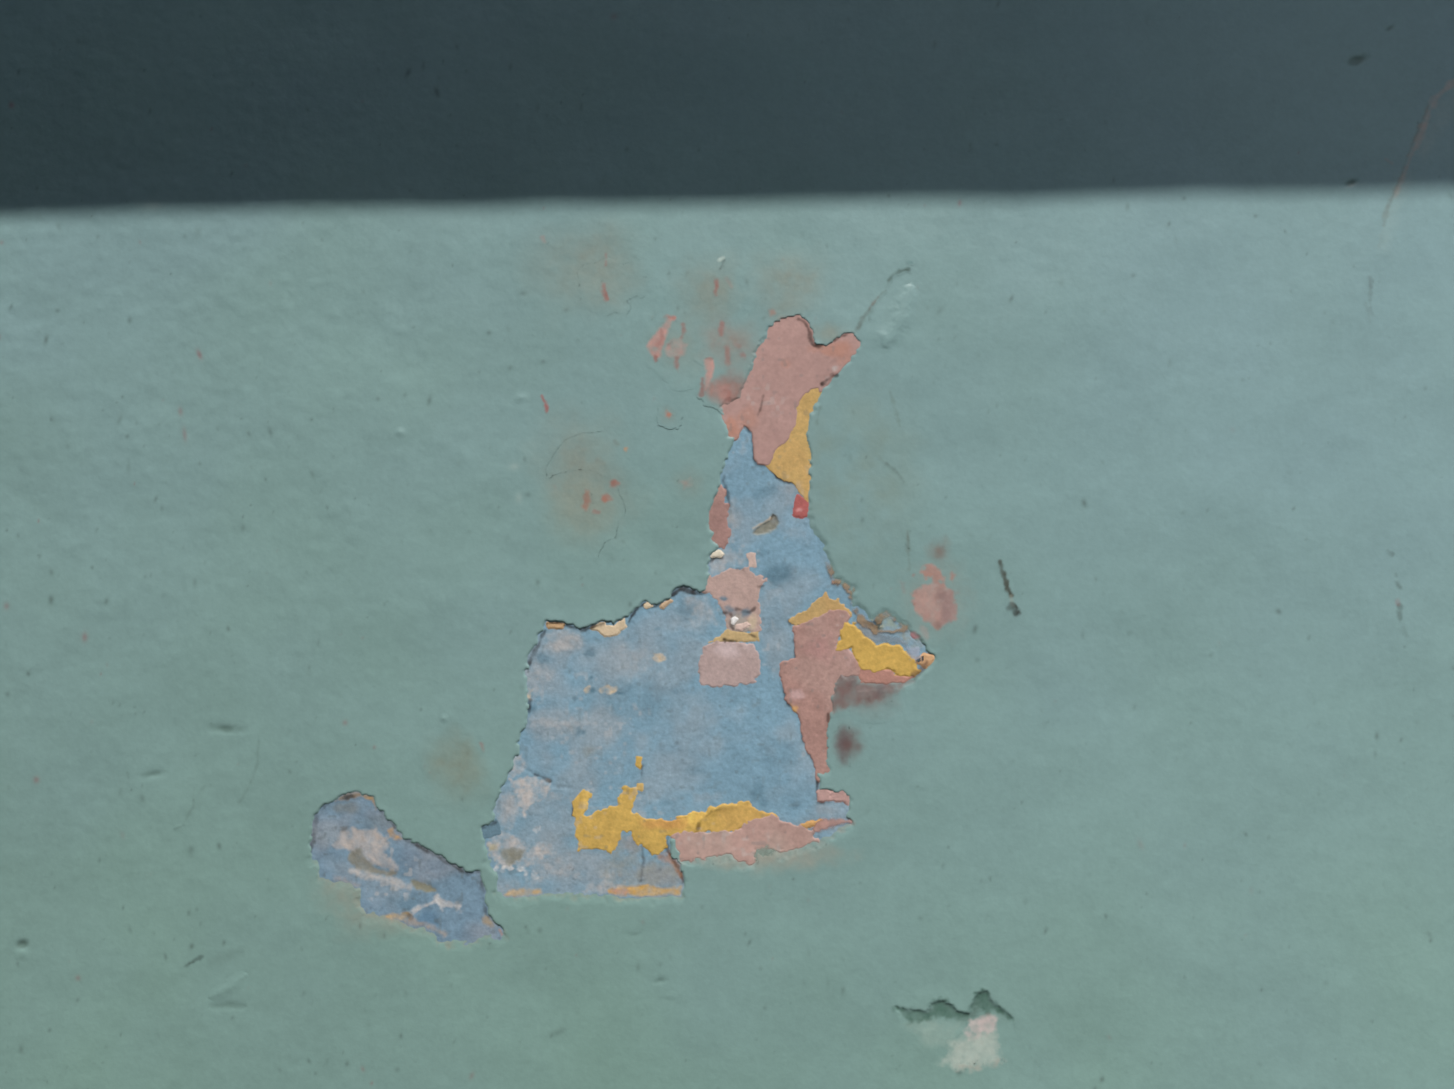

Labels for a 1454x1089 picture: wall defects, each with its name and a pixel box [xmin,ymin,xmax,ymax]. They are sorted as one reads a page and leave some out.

peeling [310,315,986,954]